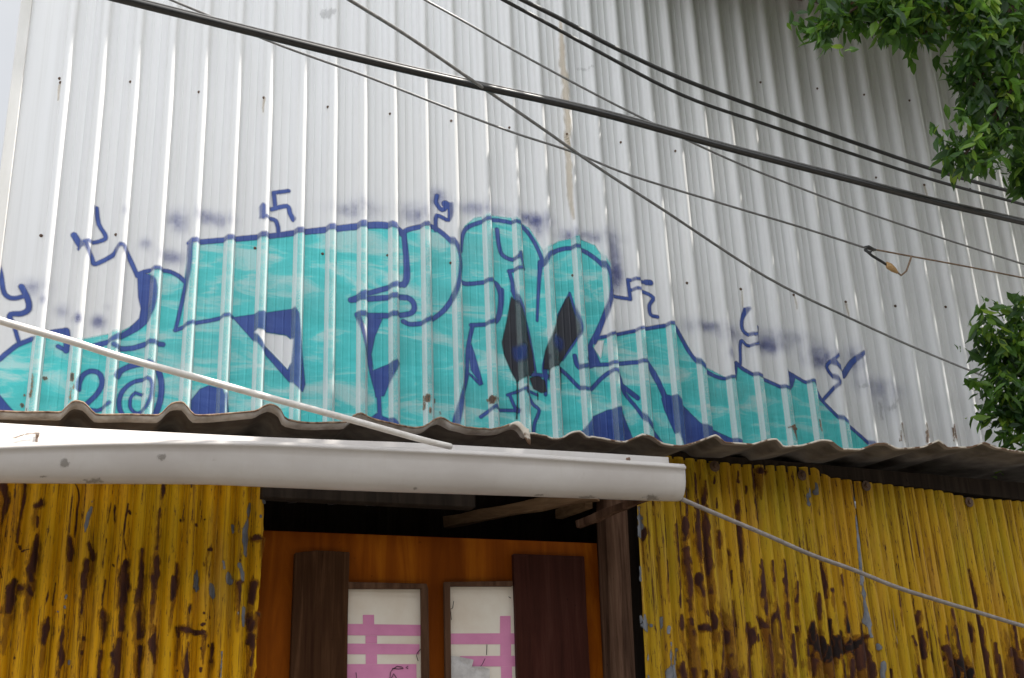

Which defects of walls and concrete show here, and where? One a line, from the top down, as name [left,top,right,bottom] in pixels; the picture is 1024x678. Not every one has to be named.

rust [0,372,510,430]
rust [0,483,214,678]
peeling [193,570,215,599]
rust [222,578,261,678]
peeling [222,499,266,585]
peeling [640,614,678,678]
rust [656,463,900,678]
peeling [853,497,887,678]
rust [898,569,1024,678]